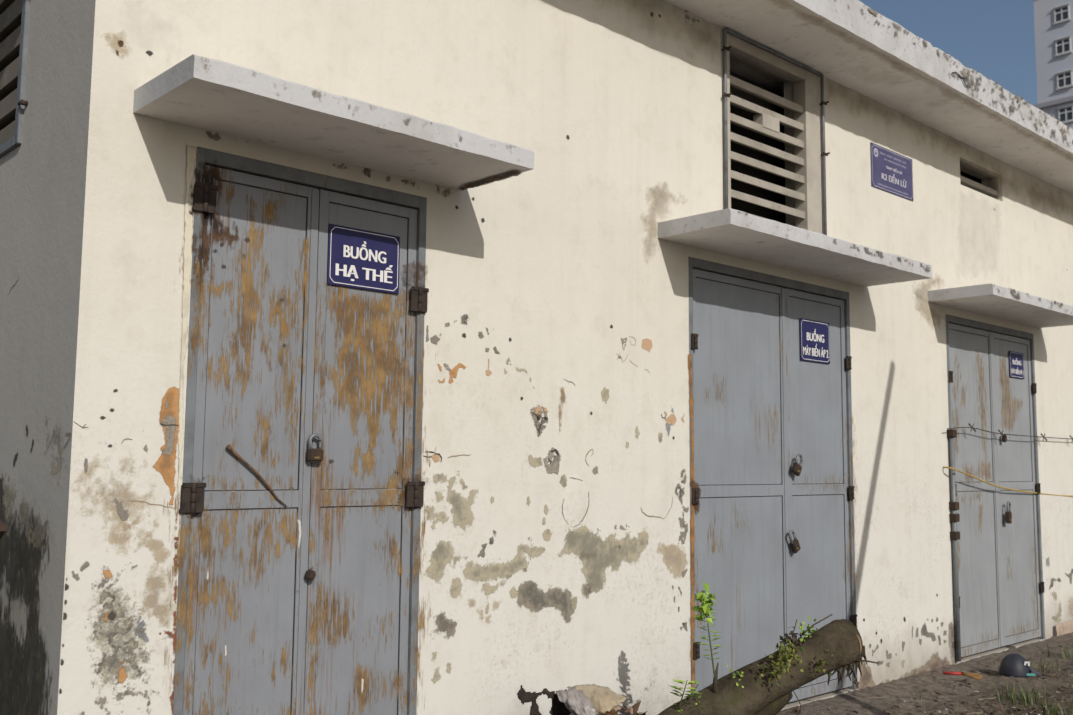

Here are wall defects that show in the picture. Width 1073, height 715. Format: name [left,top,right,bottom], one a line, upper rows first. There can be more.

peeling [143,387,180,505]
rust [159,162,431,715]
rust [1000,357,1022,432]
peeling [675,469,689,544]
water stain [0,477,52,715]
spalling [63,561,89,620]
spalling [87,570,154,715]